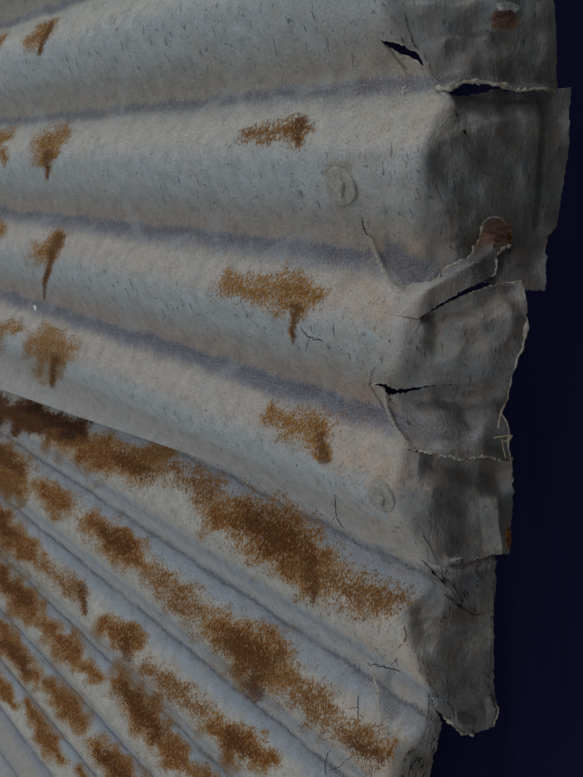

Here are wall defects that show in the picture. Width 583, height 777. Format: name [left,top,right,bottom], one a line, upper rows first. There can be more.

corrosion [20,18,59,55]
corrosion [27,118,80,178]
corrosion [236,112,317,152]
corrosion [22,226,70,286]
corrosion [206,257,336,341]
corrosion [0,315,84,395]
corrosion [0,391,423,777]